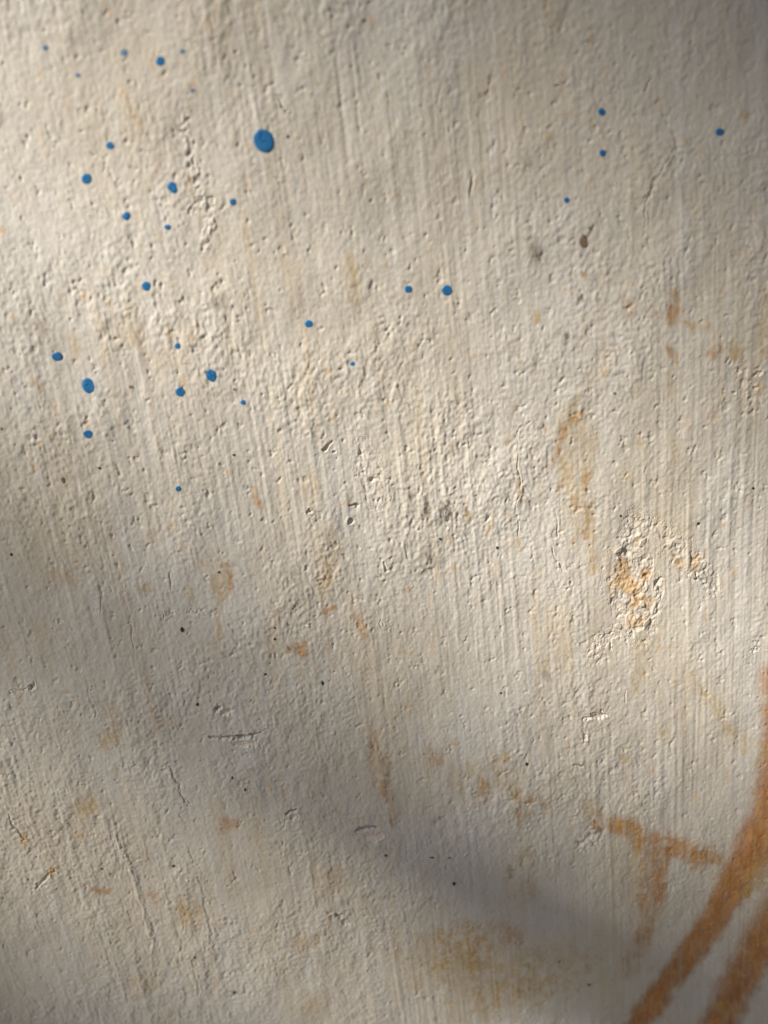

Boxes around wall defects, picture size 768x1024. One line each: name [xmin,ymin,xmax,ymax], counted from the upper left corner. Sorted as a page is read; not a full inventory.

spalling [585,505,724,667]
corrosion [630,733,768,1024]